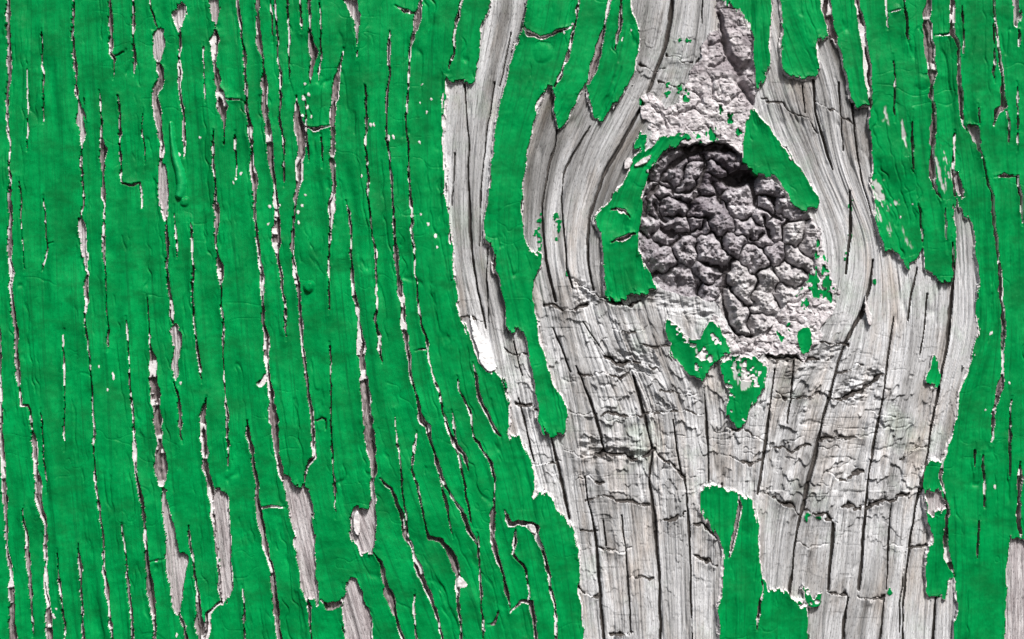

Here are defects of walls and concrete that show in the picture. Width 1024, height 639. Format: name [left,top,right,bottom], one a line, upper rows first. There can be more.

crack [0,0,558,639]
crack [449,0,623,329]
peeling [419,0,993,639]
crack [505,0,1024,639]